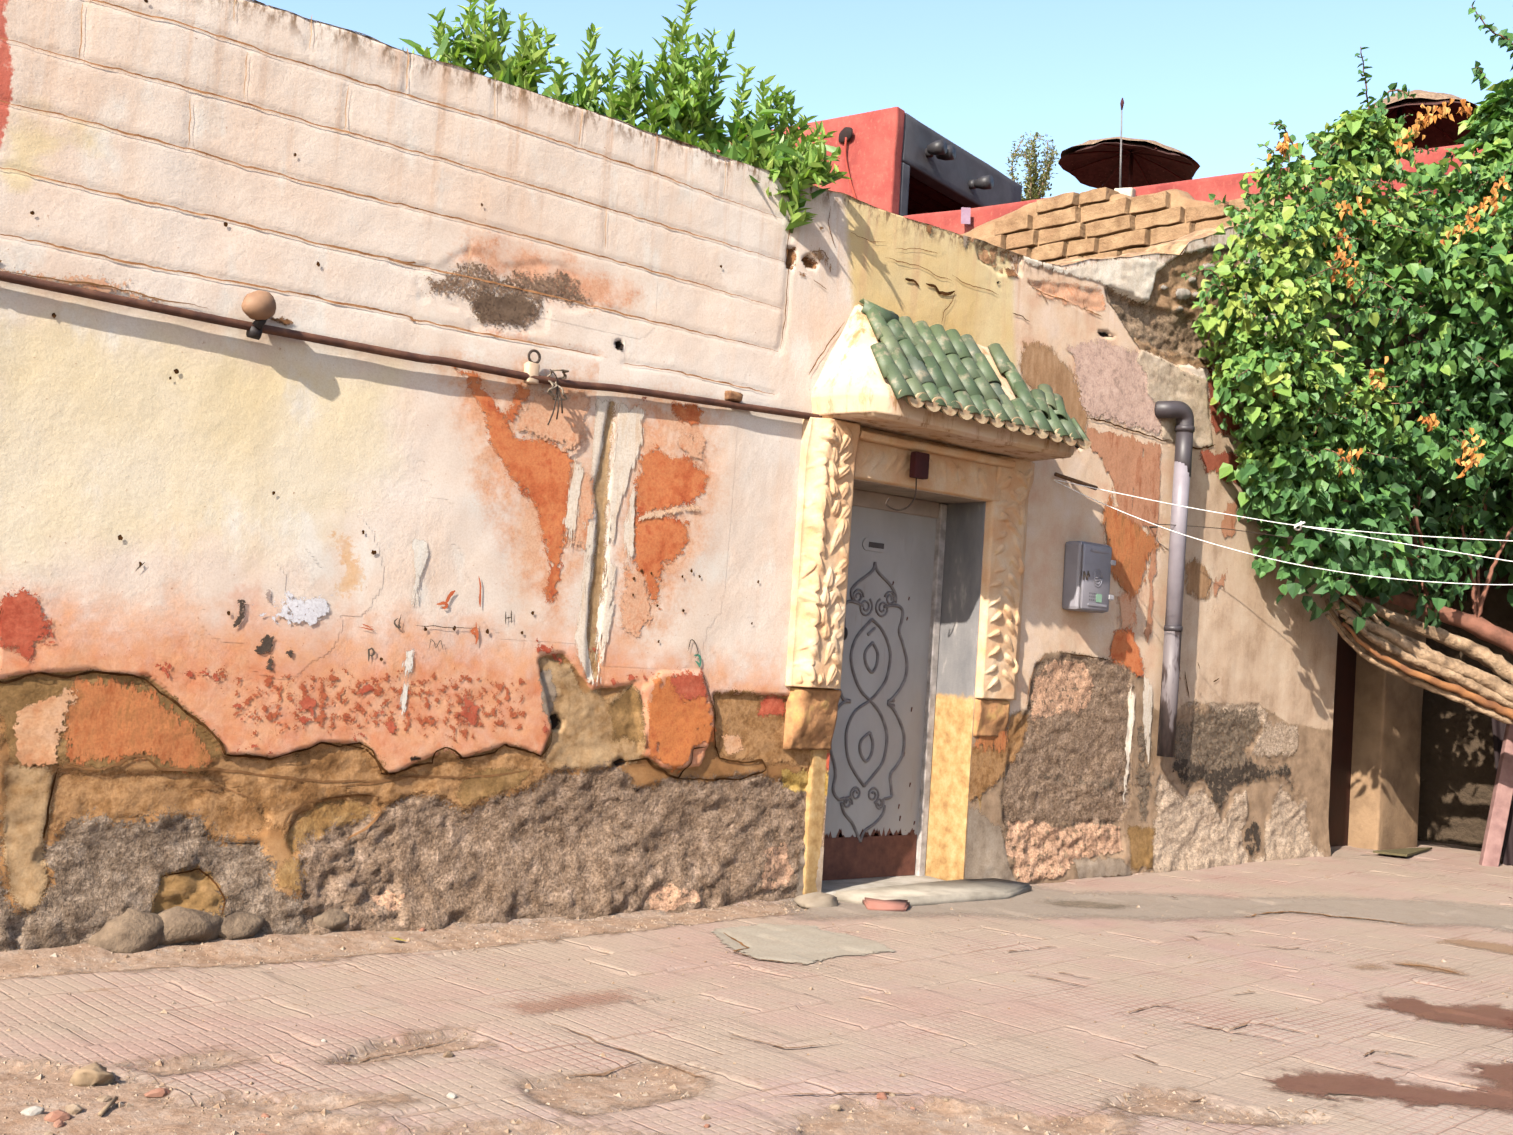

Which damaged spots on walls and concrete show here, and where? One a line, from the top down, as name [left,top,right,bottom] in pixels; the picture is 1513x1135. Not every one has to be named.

spalling [0,584,830,952]
spalling [969,651,1135,883]
spalling [1152,774,1324,873]
spalling [1179,677,1299,758]